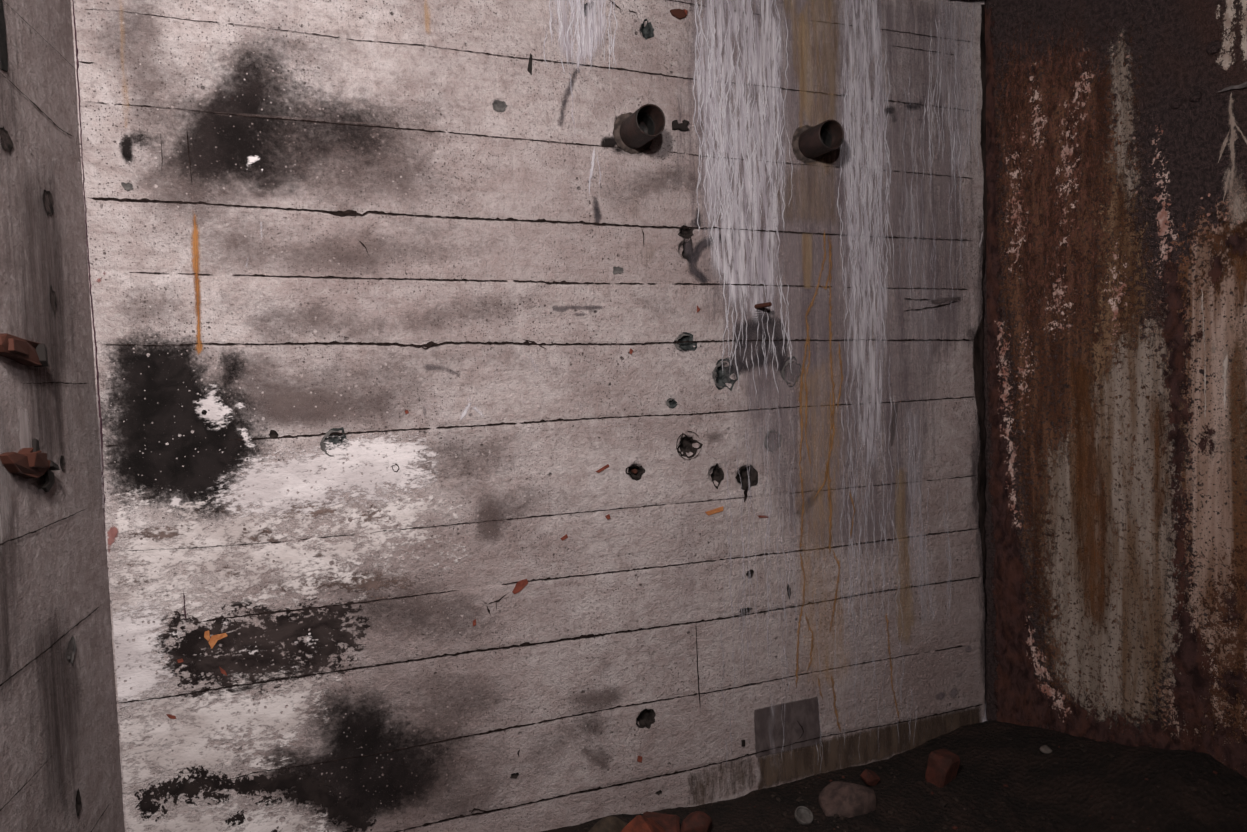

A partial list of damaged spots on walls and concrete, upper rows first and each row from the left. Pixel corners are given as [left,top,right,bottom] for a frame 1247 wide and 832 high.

corrosion [192,213,202,354]
water stain [544,0,617,73]
corrosion [796,230,843,732]
water stain [691,0,984,552]
peeling [973,4,1247,777]
corrosion [985,3,1247,779]
water stain [1216,0,1247,70]
water stain [1218,92,1247,220]